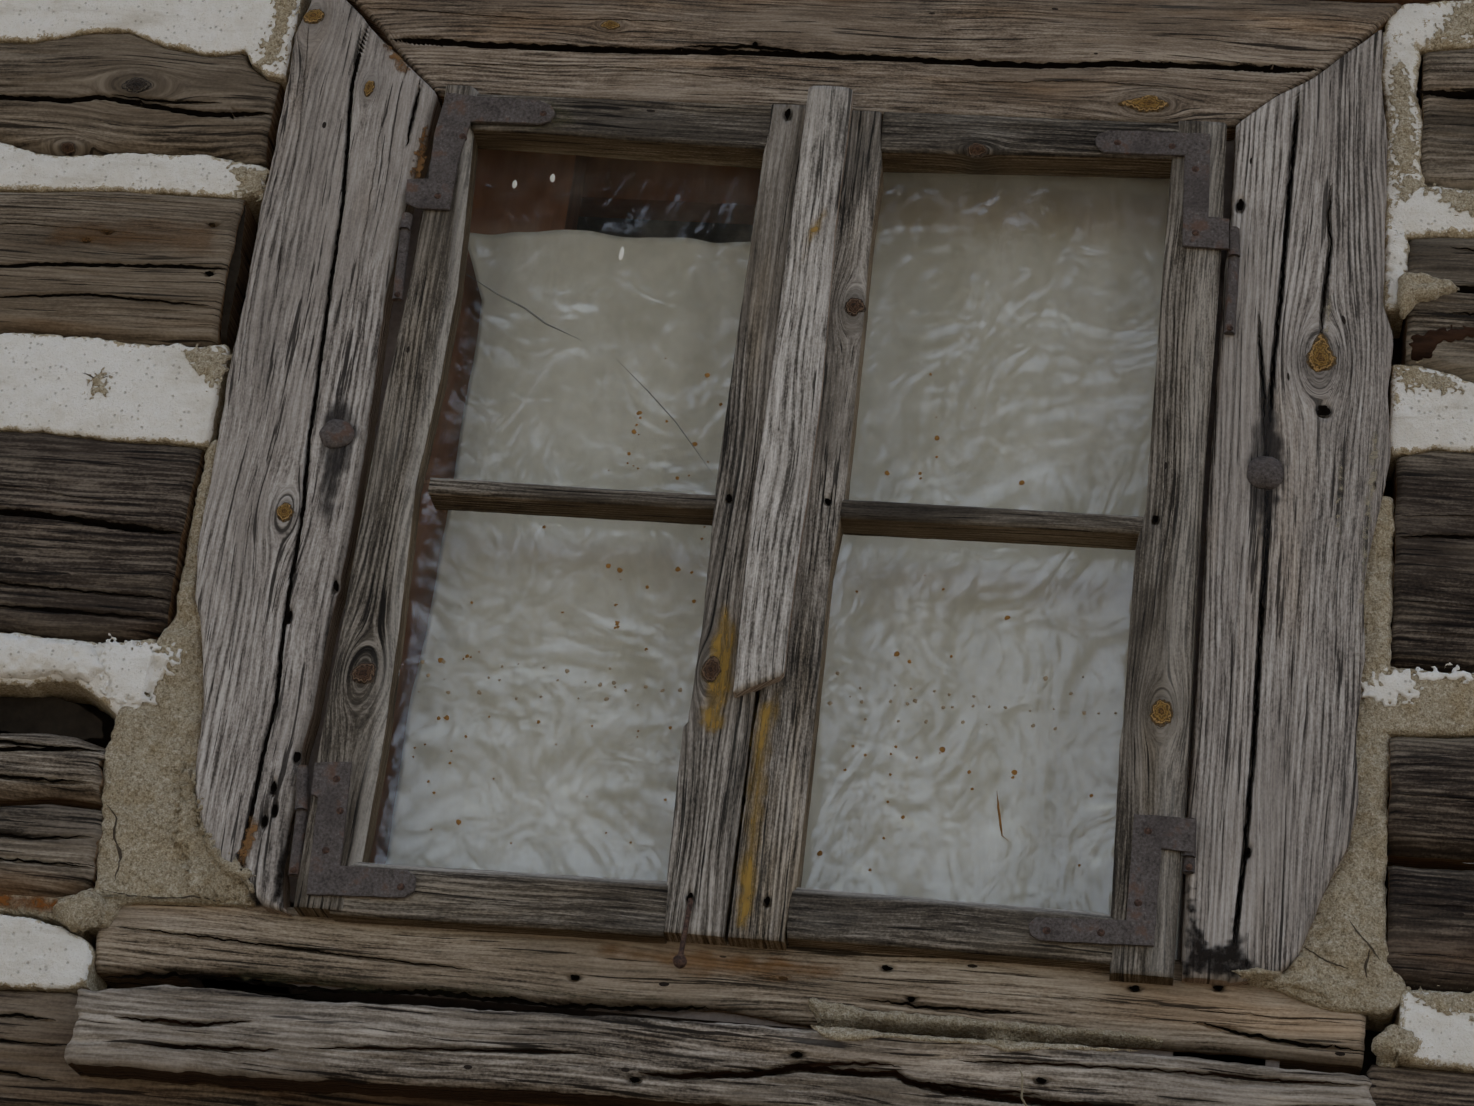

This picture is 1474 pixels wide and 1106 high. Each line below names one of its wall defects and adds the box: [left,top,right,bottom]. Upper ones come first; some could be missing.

crack [0,26,309,381]
crack [1320,183,1333,333]
crack [0,484,180,534]
crack [241,8,1317,941]
crack [0,581,169,621]
spalling [0,696,103,740]
peeling [98,633,187,709]
peeling [1361,662,1474,707]
crack [0,740,709,1053]
crack [640,974,1368,1106]